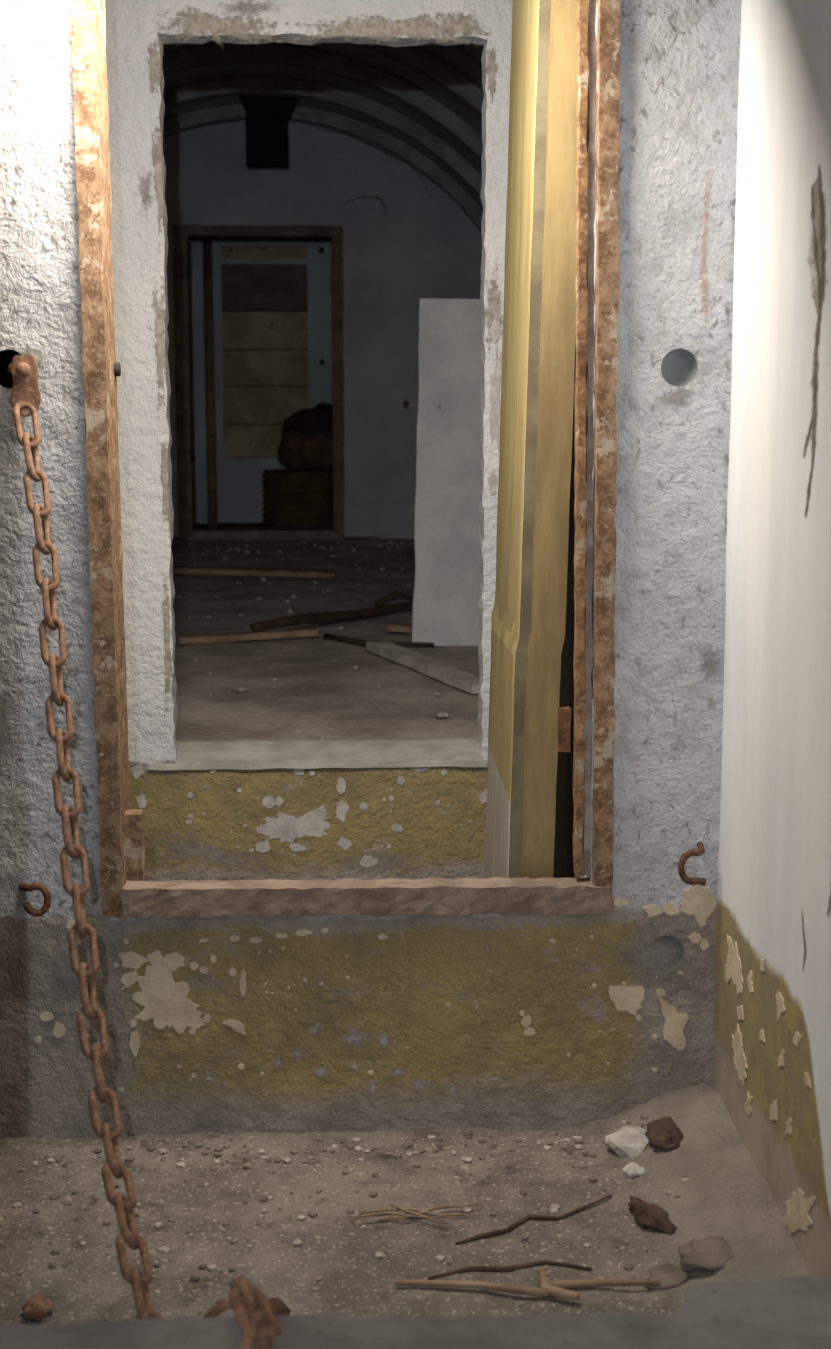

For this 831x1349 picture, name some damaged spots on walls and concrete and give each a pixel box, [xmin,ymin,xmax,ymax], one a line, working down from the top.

crack [803,165,825,517]
peeling [255,778,378,867]
peeling [230,928,329,943]
peeling [614,884,717,950]
peeling [118,938,246,1057]
peeling [609,985,689,1051]
peeling [725,935,766,1116]
peeling [775,991,785,1021]
peeling [778,1031,801,1068]
peeling [770,1099,792,1136]
spalling [782,1188,816,1235]